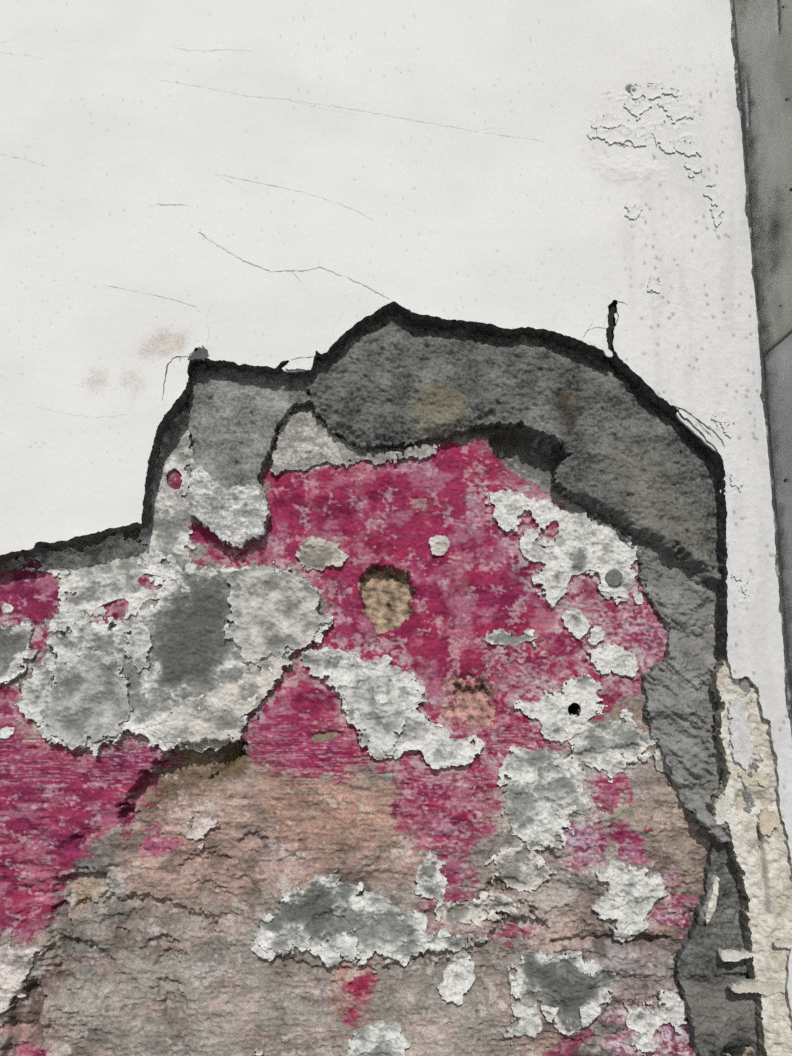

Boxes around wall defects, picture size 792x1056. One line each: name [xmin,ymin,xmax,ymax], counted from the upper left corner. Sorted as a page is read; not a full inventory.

peeling [581,76,725,227]
spalling [0,300,792,1056]